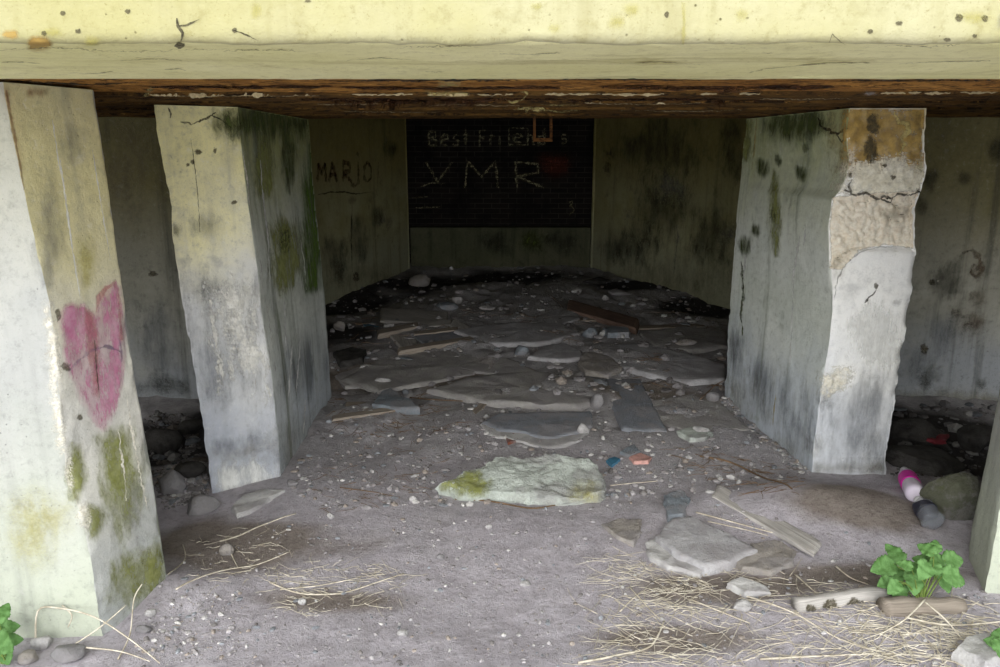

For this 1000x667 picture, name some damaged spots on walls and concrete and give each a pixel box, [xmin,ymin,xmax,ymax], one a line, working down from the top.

crack [168,108,231,227]
spalling [829,109,924,270]
crack [844,179,920,203]